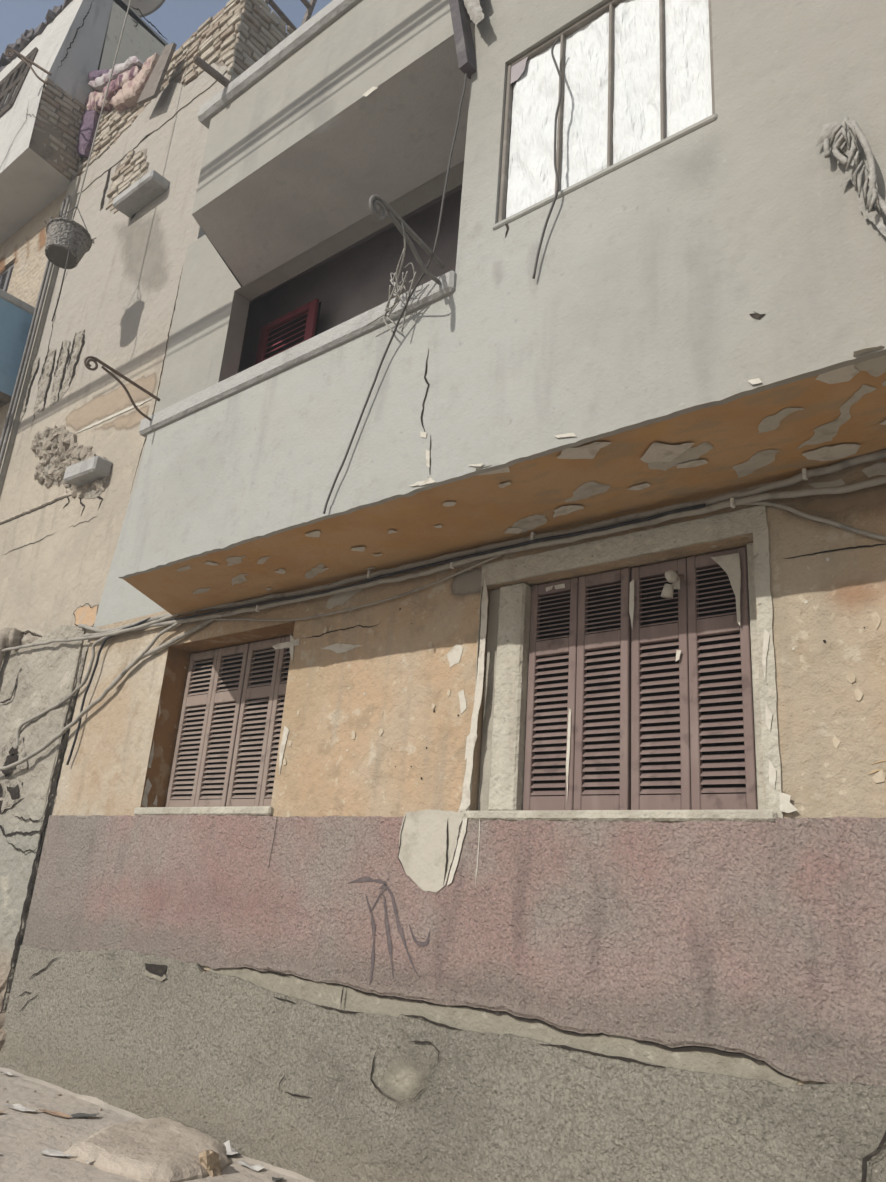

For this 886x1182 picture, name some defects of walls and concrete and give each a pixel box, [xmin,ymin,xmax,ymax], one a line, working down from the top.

crack [57,2,92,71]
spalling [31,425,112,515]
crack [420,349,431,473]
peeling [555,433,611,459]
peeling [641,442,714,471]
peeling [733,450,780,478]
peeling [758,408,804,433]
peeling [797,346,886,461]
peeling [504,481,611,534]
peeling [272,635,305,661]
peeling [398,577,488,892]
spalling [0,736,27,813]